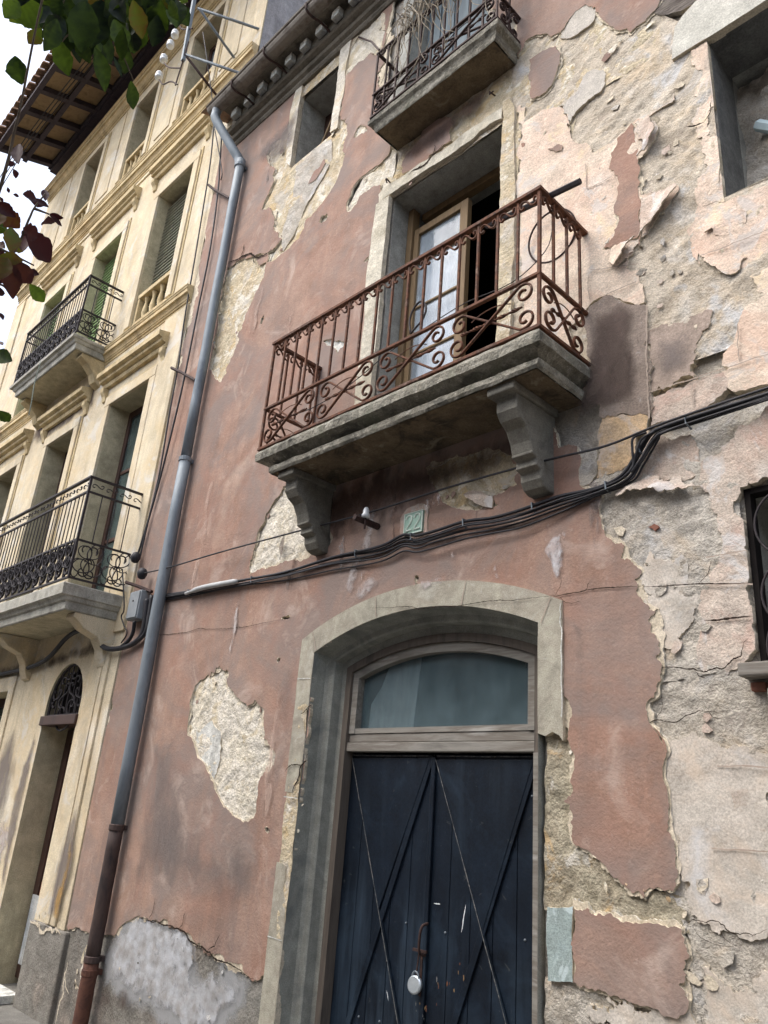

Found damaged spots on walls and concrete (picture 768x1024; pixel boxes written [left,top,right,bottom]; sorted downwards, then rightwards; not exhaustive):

peeling [212,121,367,380]
spalling [348,15,768,360]
spalling [570,321,590,368]
peeling [250,489,306,574]
peeling [426,451,517,510]
crack [386,563,740,610]
spalling [588,436,768,766]
peeling [190,670,275,821]
spalling [543,728,768,1024]
peeling [112,917,234,1024]